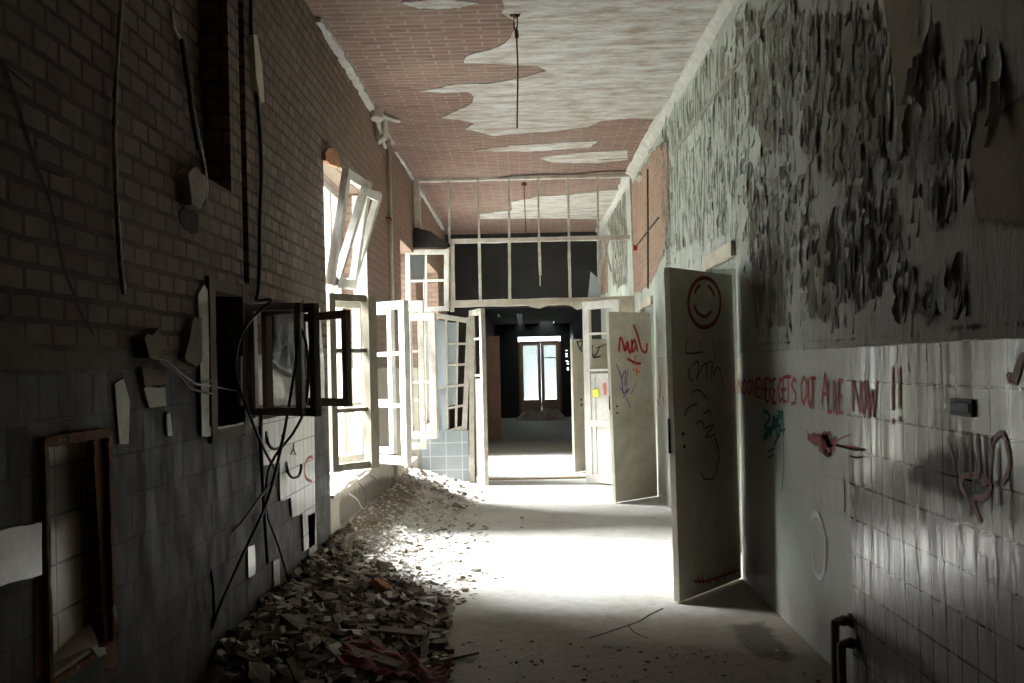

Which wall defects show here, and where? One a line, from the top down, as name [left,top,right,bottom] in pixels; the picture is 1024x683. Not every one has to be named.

flaking render [401,0,478,9]
spalling [321,147,340,168]
flaking render [418,0,1024,351]